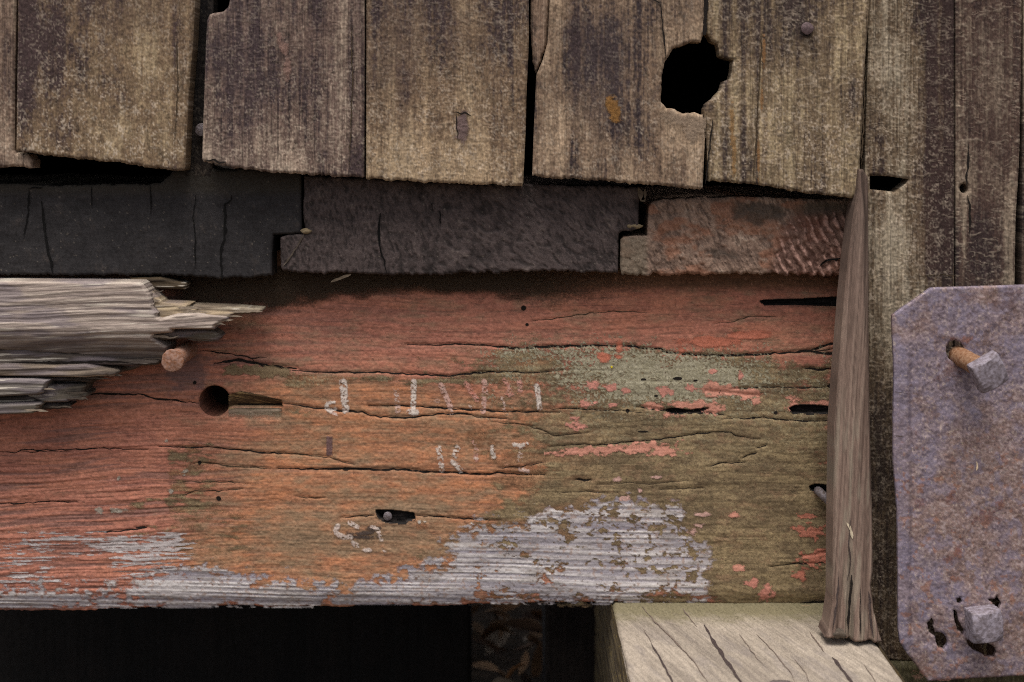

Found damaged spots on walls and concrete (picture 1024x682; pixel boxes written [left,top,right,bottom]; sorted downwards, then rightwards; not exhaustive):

crack [24,187,53,275]
crack [192,195,232,279]
crack [202,343,833,389]
peeling [565,381,631,431]
peeling [642,369,763,418]
peeling [784,395,829,410]
crack [9,403,827,497]
peeling [544,439,689,457]
peeling [0,489,713,608]
peeling [790,513,826,582]
peeling [733,564,776,603]
crack [642,606,809,682]